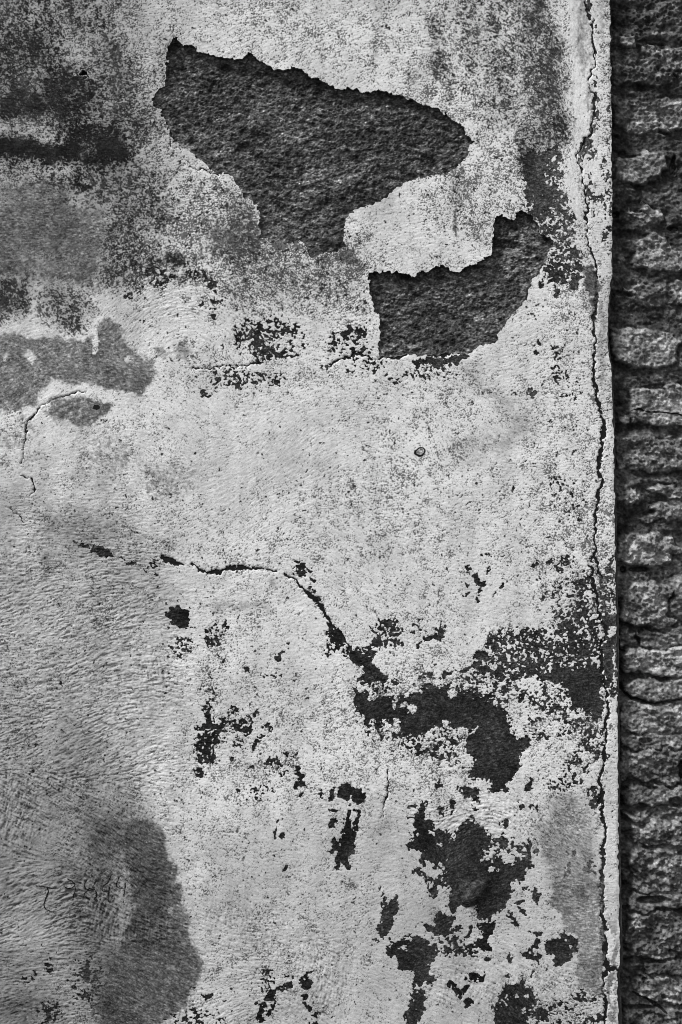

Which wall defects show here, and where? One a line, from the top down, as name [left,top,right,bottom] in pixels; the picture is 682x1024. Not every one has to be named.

leakage [0,0,364,426]
flaking render [152,37,475,258]
flaking render [327,76,612,385]
crack [20,391,84,492]
peeling [200,314,309,398]
crack [575,1,667,1024]
peeling [162,600,229,663]
peeling [193,671,273,778]
crack [161,554,386,681]
peeling [236,752,367,870]
peeling [322,553,618,1024]
leakage [91,819,204,1024]